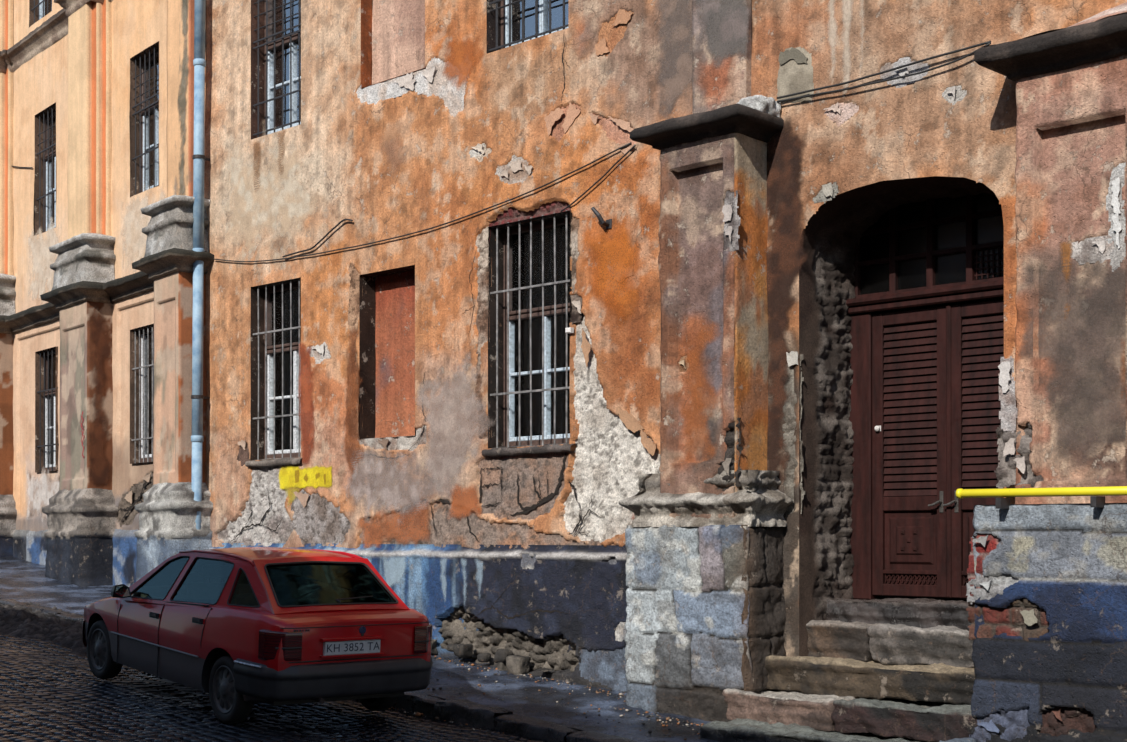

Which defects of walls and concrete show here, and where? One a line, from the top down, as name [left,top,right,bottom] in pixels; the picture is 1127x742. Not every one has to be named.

peeling [354,57,467,117]
crack [561,36,570,98]
peeling [544,102,637,154]
peeling [722,190,740,252]
peeling [1070,162,1126,272]
flaking render [359,201,660,569]
spalling [994,356,1044,489]
flaking render [217,440,309,547]
damp [462,560,483,595]
flaking render [966,533,1049,641]
spalling [431,606,579,675]
peeling [969,706,1097,742]